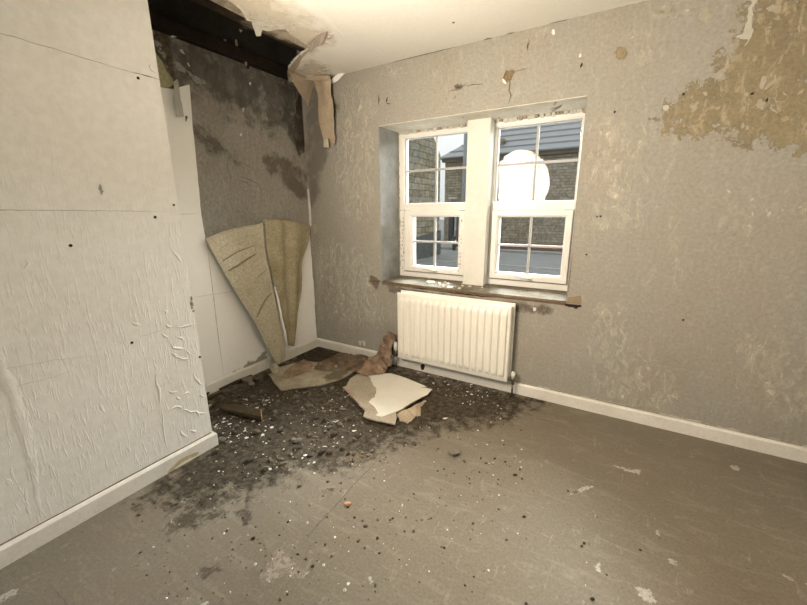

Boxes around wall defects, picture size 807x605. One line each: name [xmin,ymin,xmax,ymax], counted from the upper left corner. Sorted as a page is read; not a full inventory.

damp [153,31,305,155]
peeling [649,0,807,158]
damp [263,156,307,198]